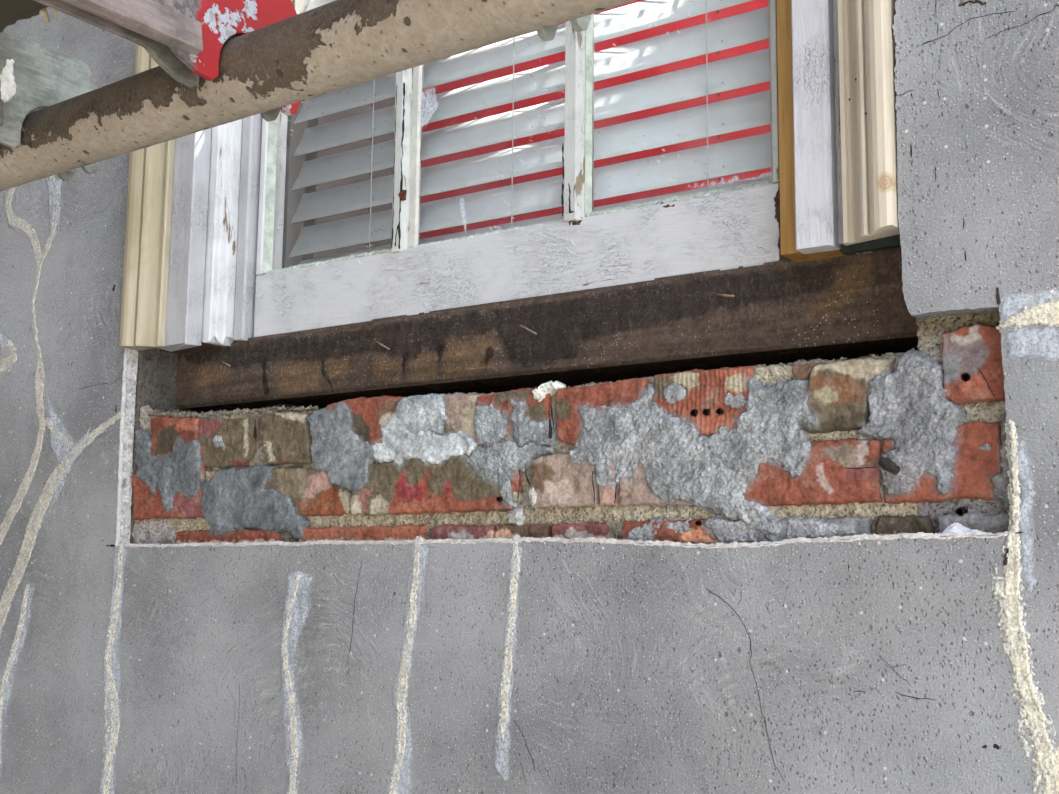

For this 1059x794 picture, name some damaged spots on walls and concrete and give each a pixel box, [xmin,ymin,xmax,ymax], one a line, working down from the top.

crack [921,2,1059,64]
flaking render [131,312,1010,545]
crack [707,589,785,782]